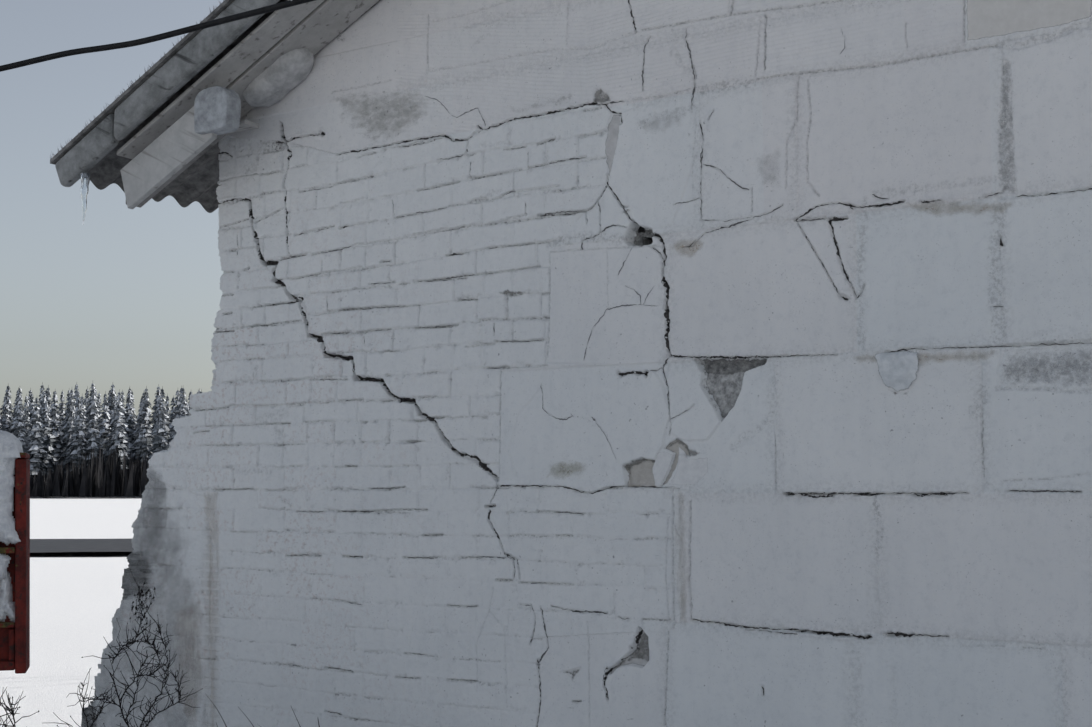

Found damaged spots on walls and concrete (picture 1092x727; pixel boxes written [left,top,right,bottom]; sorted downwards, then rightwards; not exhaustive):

crack [220,0,969,727]
spalling [700,359,767,417]
peeling [625,439,708,487]
leakage [121,553,151,599]
spalling [611,630,649,673]